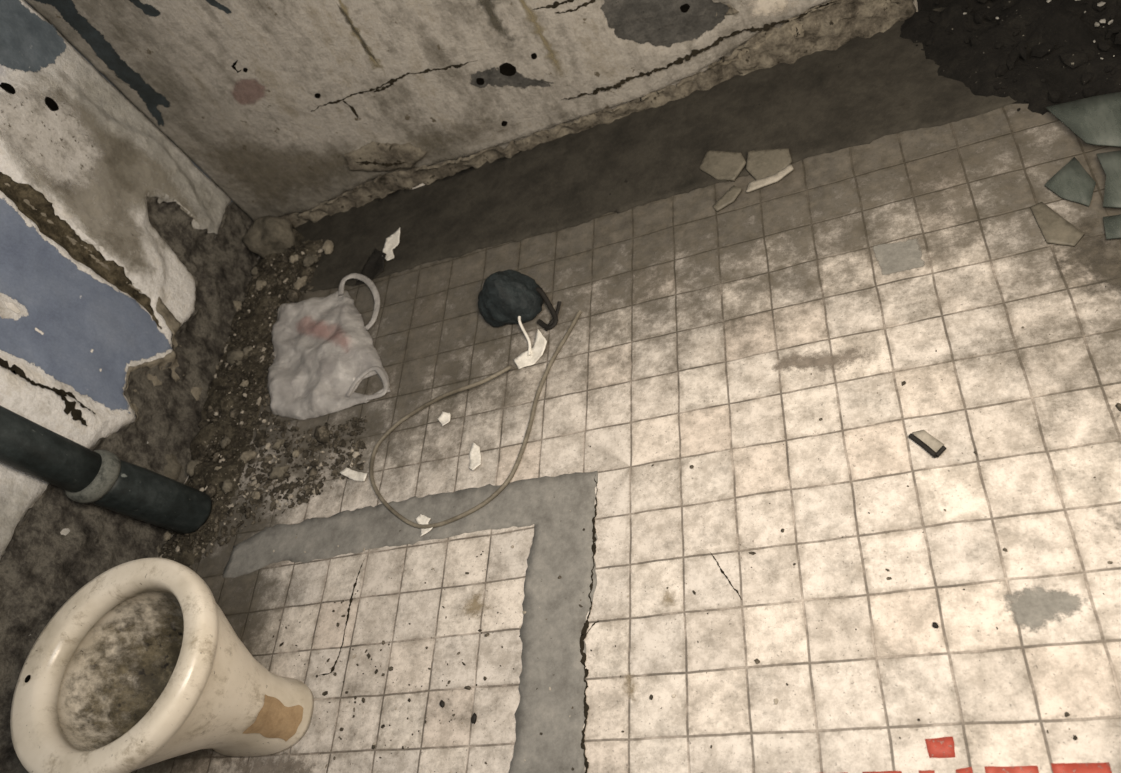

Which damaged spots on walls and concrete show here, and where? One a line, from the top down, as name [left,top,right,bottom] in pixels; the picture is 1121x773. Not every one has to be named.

peeling [0,92,100,185]
peeling [0,0,171,126]
crack [311,60,477,117]
crack [533,0,595,14]
flaking render [281,0,933,228]
crack [0,358,95,426]
peeling [0,196,259,484]
flaking render [0,484,173,773]
crack [580,475,601,773]
water stain [1005,587,1081,631]